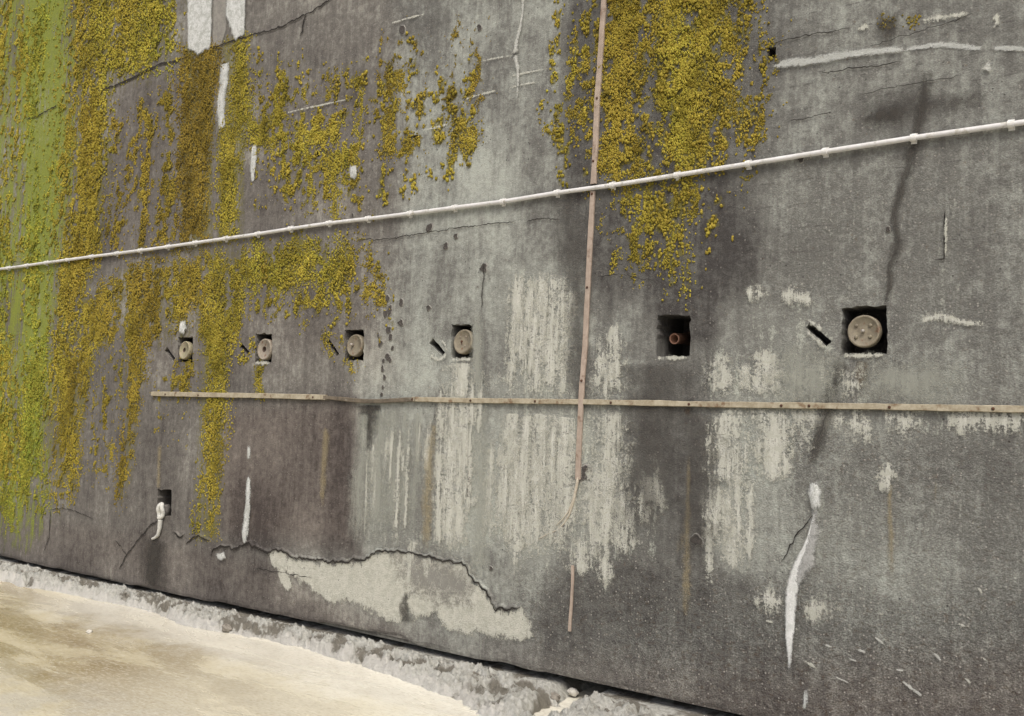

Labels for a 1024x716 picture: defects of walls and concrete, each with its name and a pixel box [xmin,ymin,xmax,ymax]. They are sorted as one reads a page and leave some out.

crack [209,0,329,49]
crack [772,28,846,44]
crack [103,59,181,90]
crack [823,14,970,304]
damp [781,284,812,306]
damp [352,273,668,590]
damp [945,404,1024,436]
damp [699,346,942,585]
damp [242,477,251,543]
crack [116,520,522,611]
spalling [268,539,533,642]
damp [754,587,781,614]